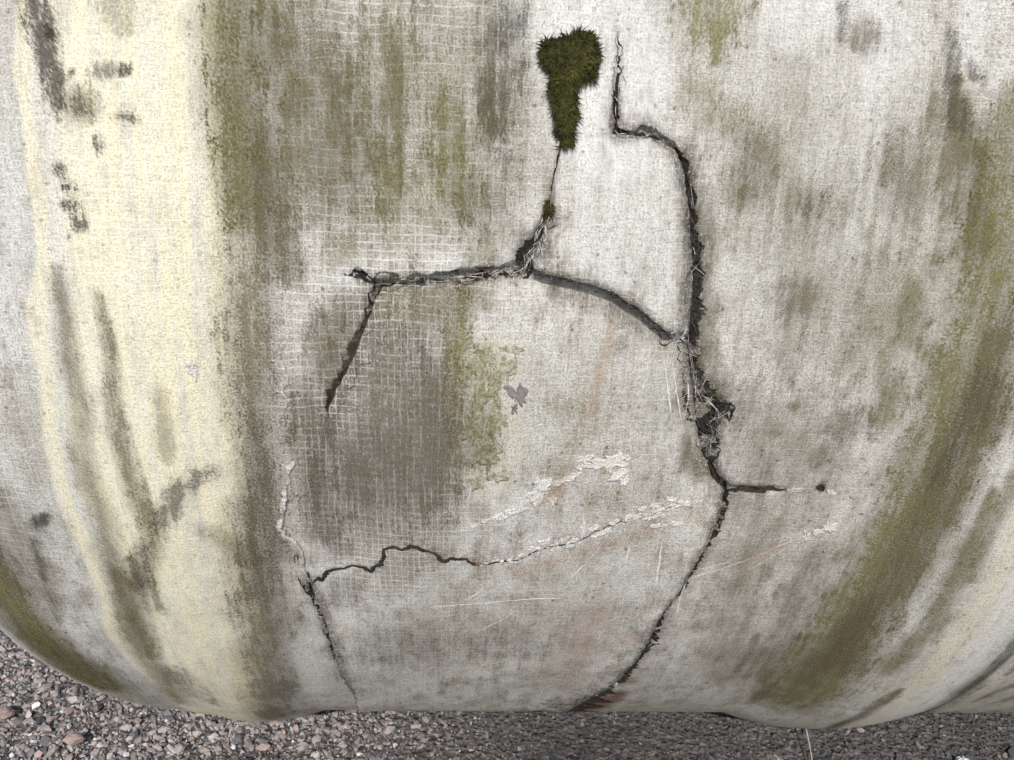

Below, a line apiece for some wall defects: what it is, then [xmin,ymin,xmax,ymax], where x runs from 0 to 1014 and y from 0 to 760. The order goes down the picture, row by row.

damp [52,162,89,238]
damp [18,0,132,122]
damp [427,1,530,222]
damp [882,28,988,230]
damp [194,0,506,720]
crack [293,34,787,713]
damp [0,512,131,697]
damp [67,291,220,706]
peeling [470,452,634,529]
peeling [480,497,691,567]
damp [792,296,1014,685]
damp [911,642,1014,716]